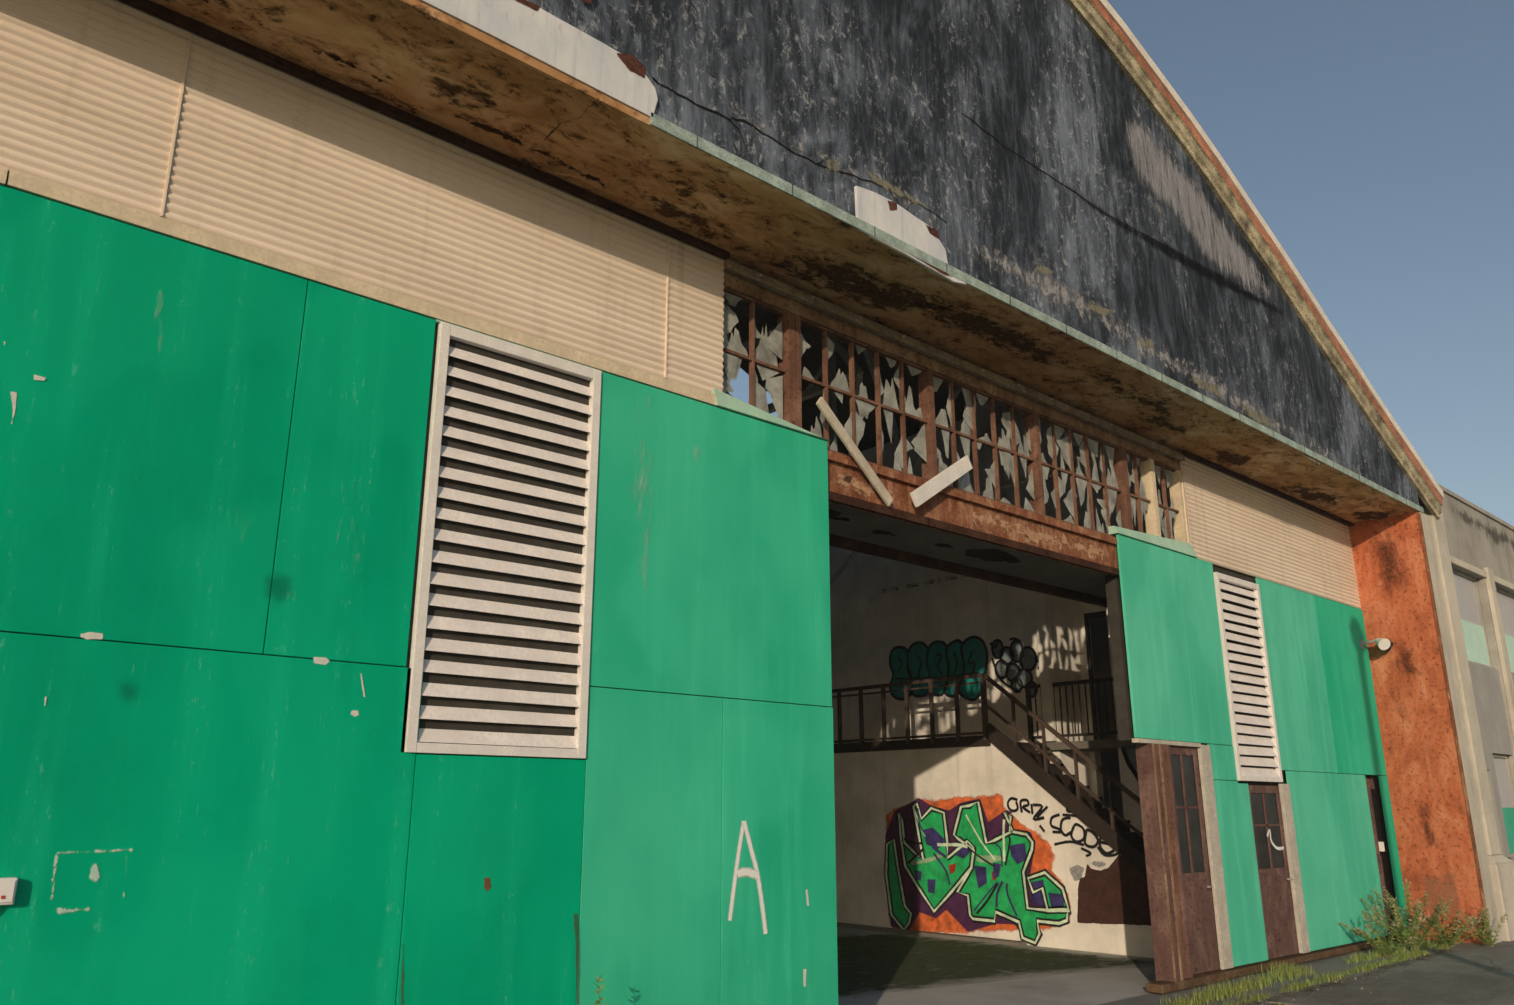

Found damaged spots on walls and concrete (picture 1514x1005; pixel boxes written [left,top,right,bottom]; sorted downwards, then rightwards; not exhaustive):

leakage [294,39,391,84]
leakage [431,76,606,188]
crack [652,77,947,223]
leakage [633,180,746,251]
leakage [1081,197,1278,312]
leakage [764,255,1186,434]
leakage [1211,448,1254,467]
corrosion [836,471,895,498]
leakage [1283,485,1389,520]
corrosion [972,511,1106,561]
corrosion [1377,543,1401,587]
peeling [80,632,103,640]